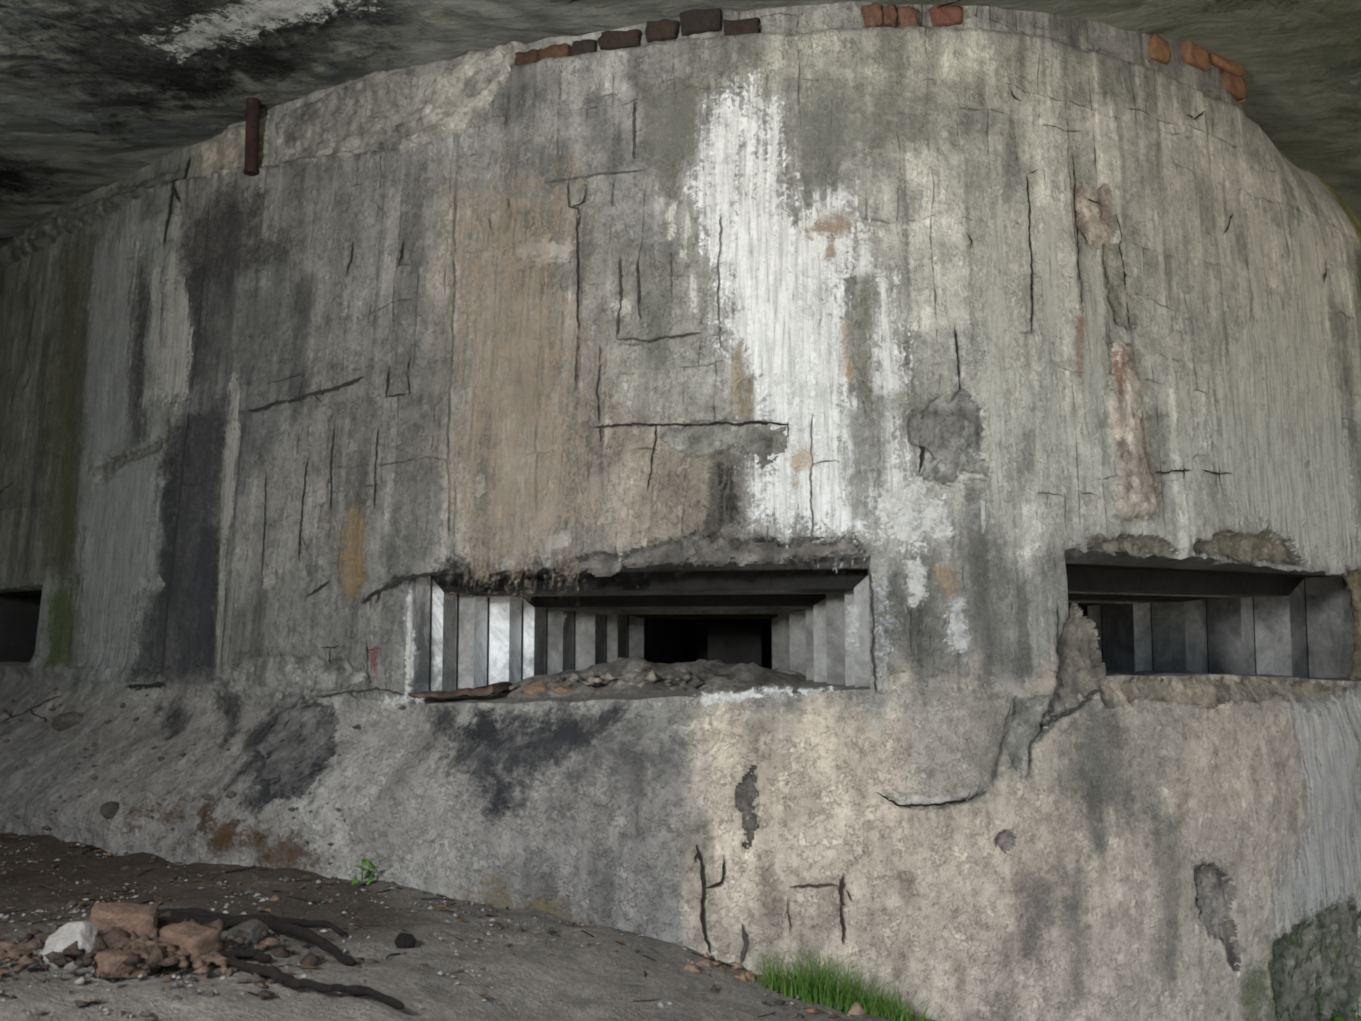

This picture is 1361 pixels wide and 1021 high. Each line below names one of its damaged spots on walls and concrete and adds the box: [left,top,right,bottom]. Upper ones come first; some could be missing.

leakage [74,230,206,680]
crack [545,96,839,555]
leakage [641,69,1064,685]
spalling [906,388,998,487]
leakage [1080,261,1112,453]
leakage [197,372,241,677]
spalling [1075,528,1306,568]
spalling [735,765,759,849]
crack [876,684,1104,807]
crack [694,844,748,964]
crack [787,872,852,945]
spalling [1194,863,1244,971]